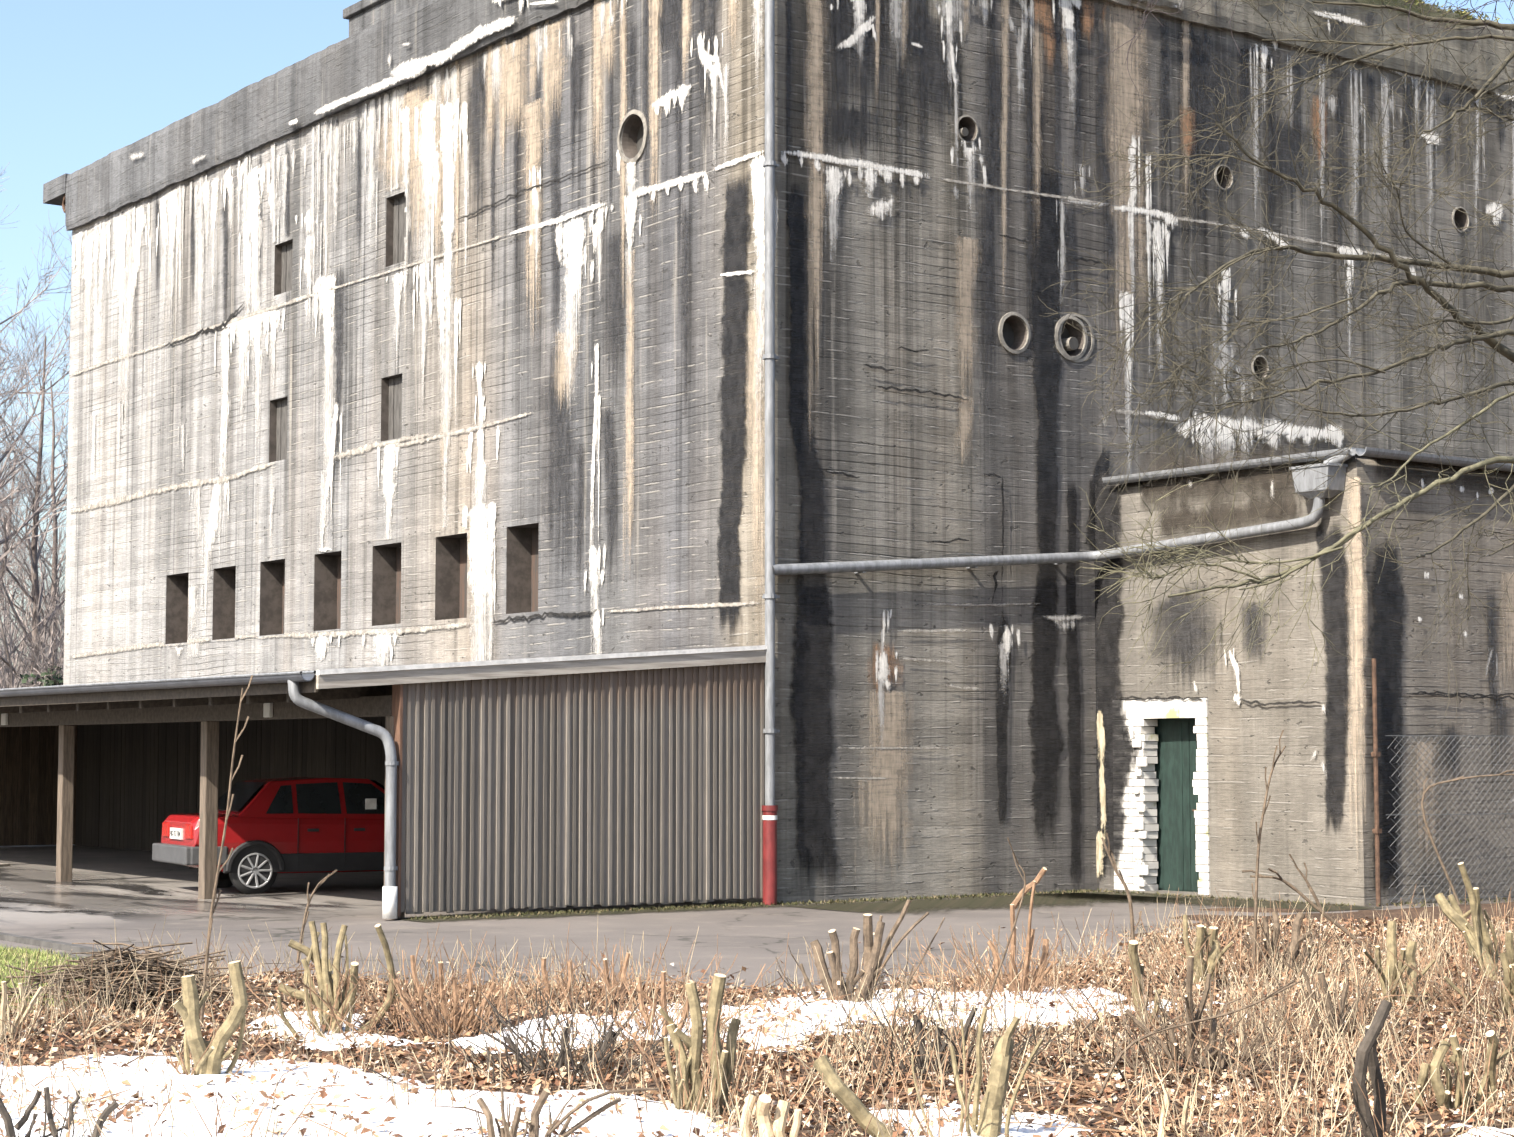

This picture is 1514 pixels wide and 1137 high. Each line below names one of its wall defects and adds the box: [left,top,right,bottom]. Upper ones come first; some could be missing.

corrosion [1001,0,1009,286]
corrosion [1033,0,1068,204]
corrosion [1183,21,1192,183]
leakage [1474,94,1514,239]
leakage [72,0,1451,890]